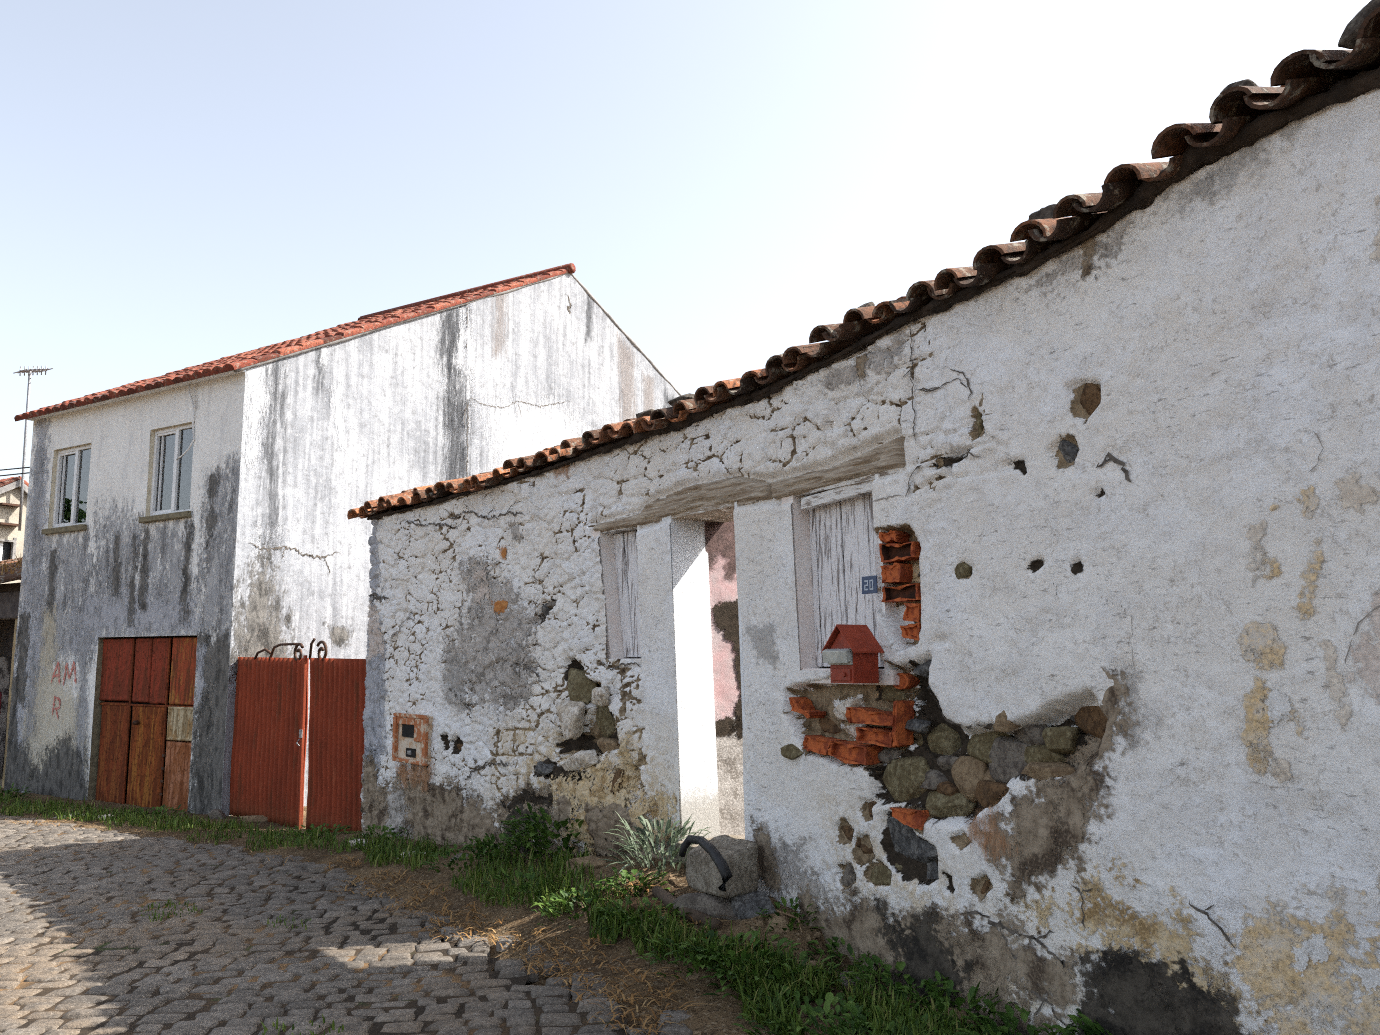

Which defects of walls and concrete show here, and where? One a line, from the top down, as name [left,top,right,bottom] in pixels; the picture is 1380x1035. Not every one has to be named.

damp [437,306,589,481]
damp [4,360,303,814]
damp [466,545,508,614]
damp [323,601,679,862]
spalling [533,658,627,794]
spalling [780,523,1108,901]
peeling [1238,619,1305,783]
peeling [1244,486,1319,588]
peeling [1317,588,1380,732]
damp [967,751,1092,891]
damp [743,804,1251,1035]
peeling [1211,866,1380,1035]